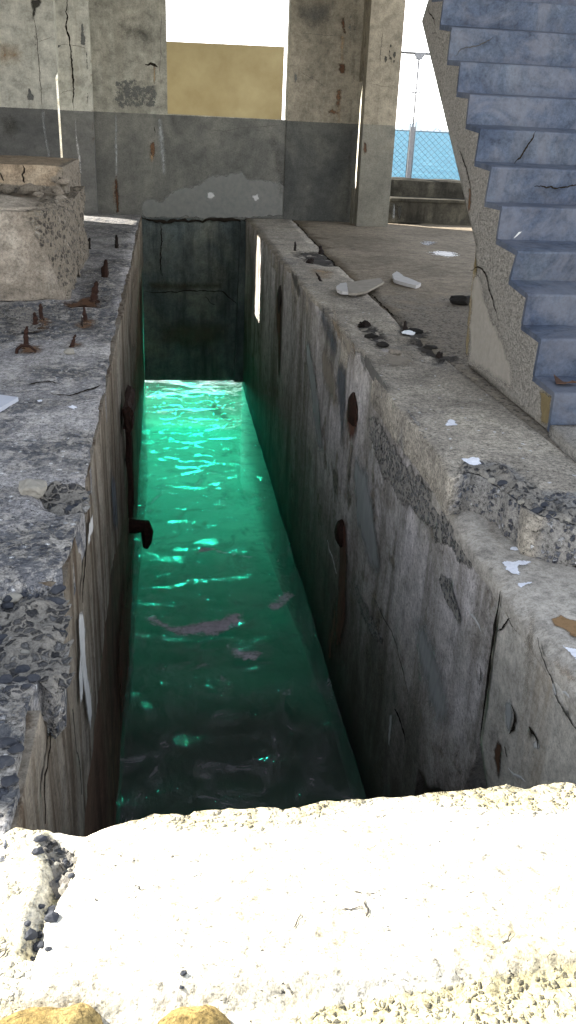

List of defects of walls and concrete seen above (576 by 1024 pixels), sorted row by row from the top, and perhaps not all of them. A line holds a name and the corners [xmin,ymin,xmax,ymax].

crack [33,0,84,108]
rust [64,297,100,328]
spalling [18,478,91,516]
spalling [453,457,576,525]
spalling [0,584,76,724]
crack [479,594,576,738]
spalling [0,737,24,788]
crack [44,709,82,824]